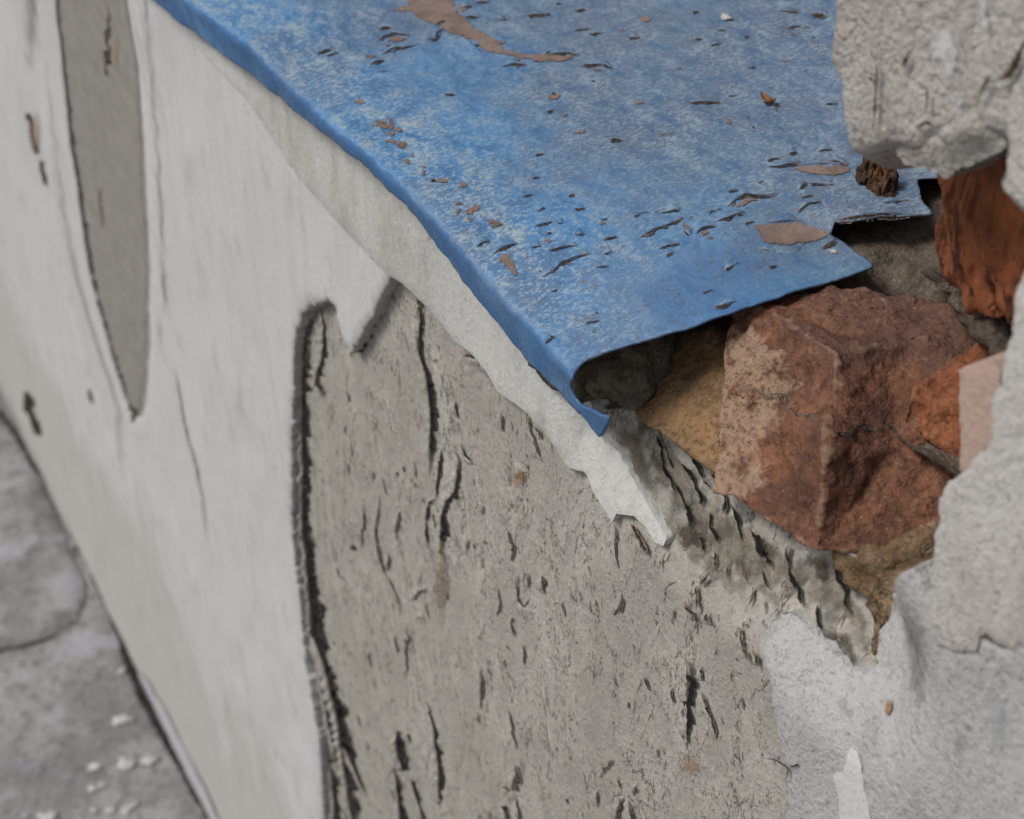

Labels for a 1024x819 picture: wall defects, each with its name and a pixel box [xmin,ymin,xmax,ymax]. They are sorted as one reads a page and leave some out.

peeling [393,0,574,68]
peeling [371,118,414,164]
peeling [455,202,480,222]
peeling [499,254,517,276]
peeling [754,212,845,260]
peeling [958,350,1007,471]
crack [296,293,475,819]
crack [590,516,663,615]
crack [648,429,852,667]
crack [474,528,565,723]
crack [643,655,744,750]
crack [478,711,522,819]